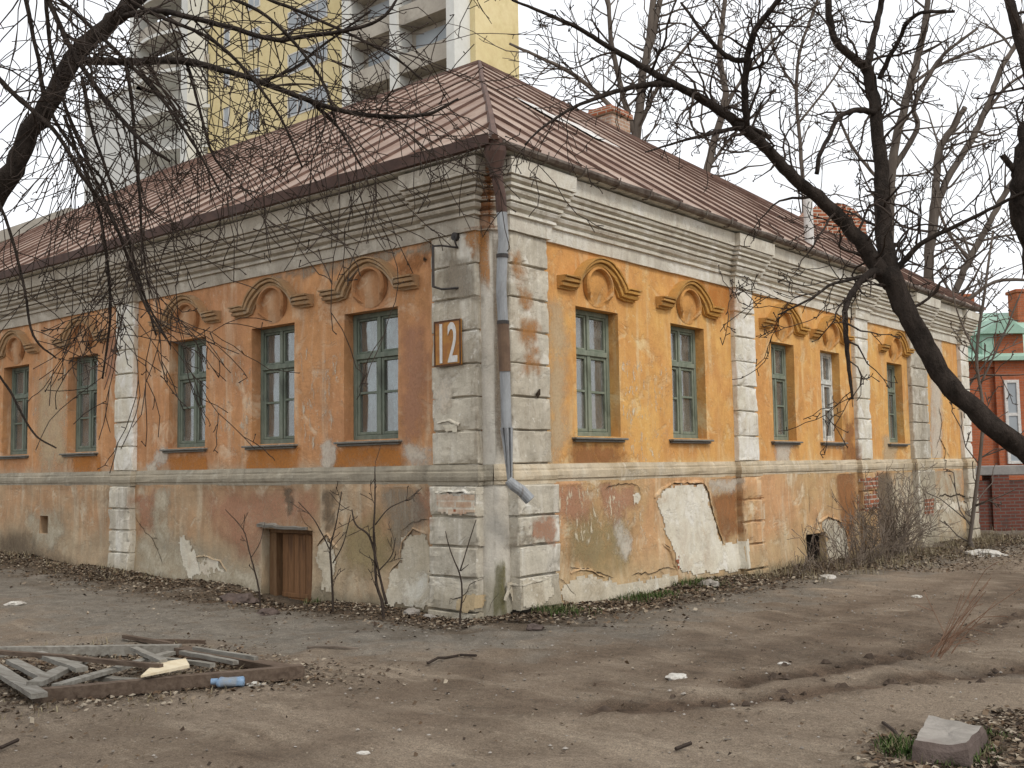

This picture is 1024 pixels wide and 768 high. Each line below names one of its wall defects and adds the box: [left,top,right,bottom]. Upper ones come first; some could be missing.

peeling [138,488,259,592]
spalling [315,532,338,592]
spalling [385,489,484,609]
leakage [571,515,632,569]
spalling [504,478,751,608]
spalling [819,515,849,560]
peeling [857,470,972,543]